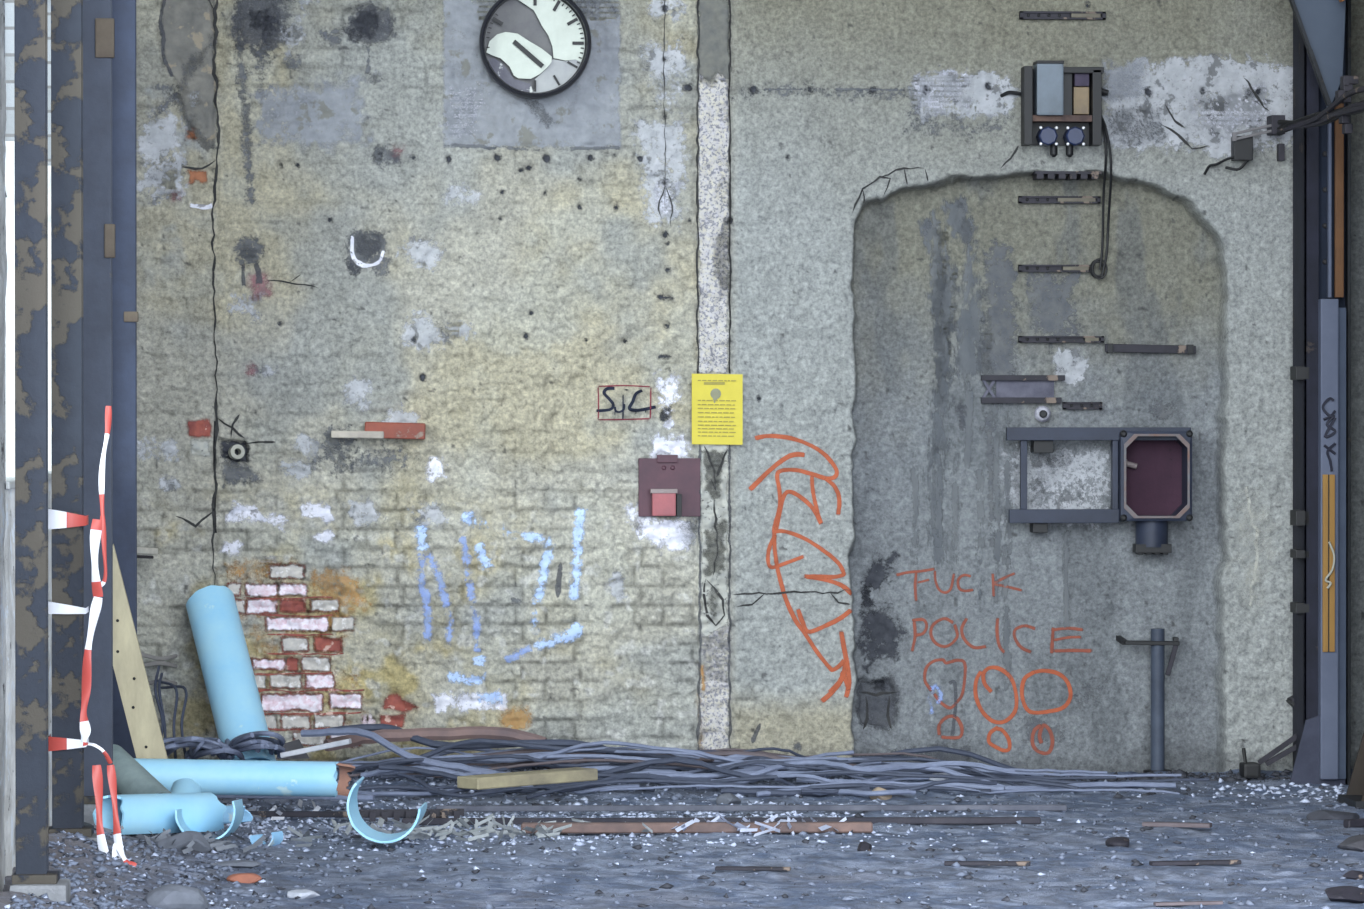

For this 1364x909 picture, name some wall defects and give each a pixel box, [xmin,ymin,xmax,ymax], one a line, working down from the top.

peeling [909,70,991,116]
crack [852,167,928,213]
crack [176,0,244,585]
peeling [402,310,476,353]
peeling [381,402,419,423]
leakage [856,195,1082,690]
peeling [137,414,379,543]
peeling [426,457,447,483]
peeling [222,540,243,555]
spalling [226,556,418,748]
peeling [431,689,508,714]
spalling [855,676,900,731]